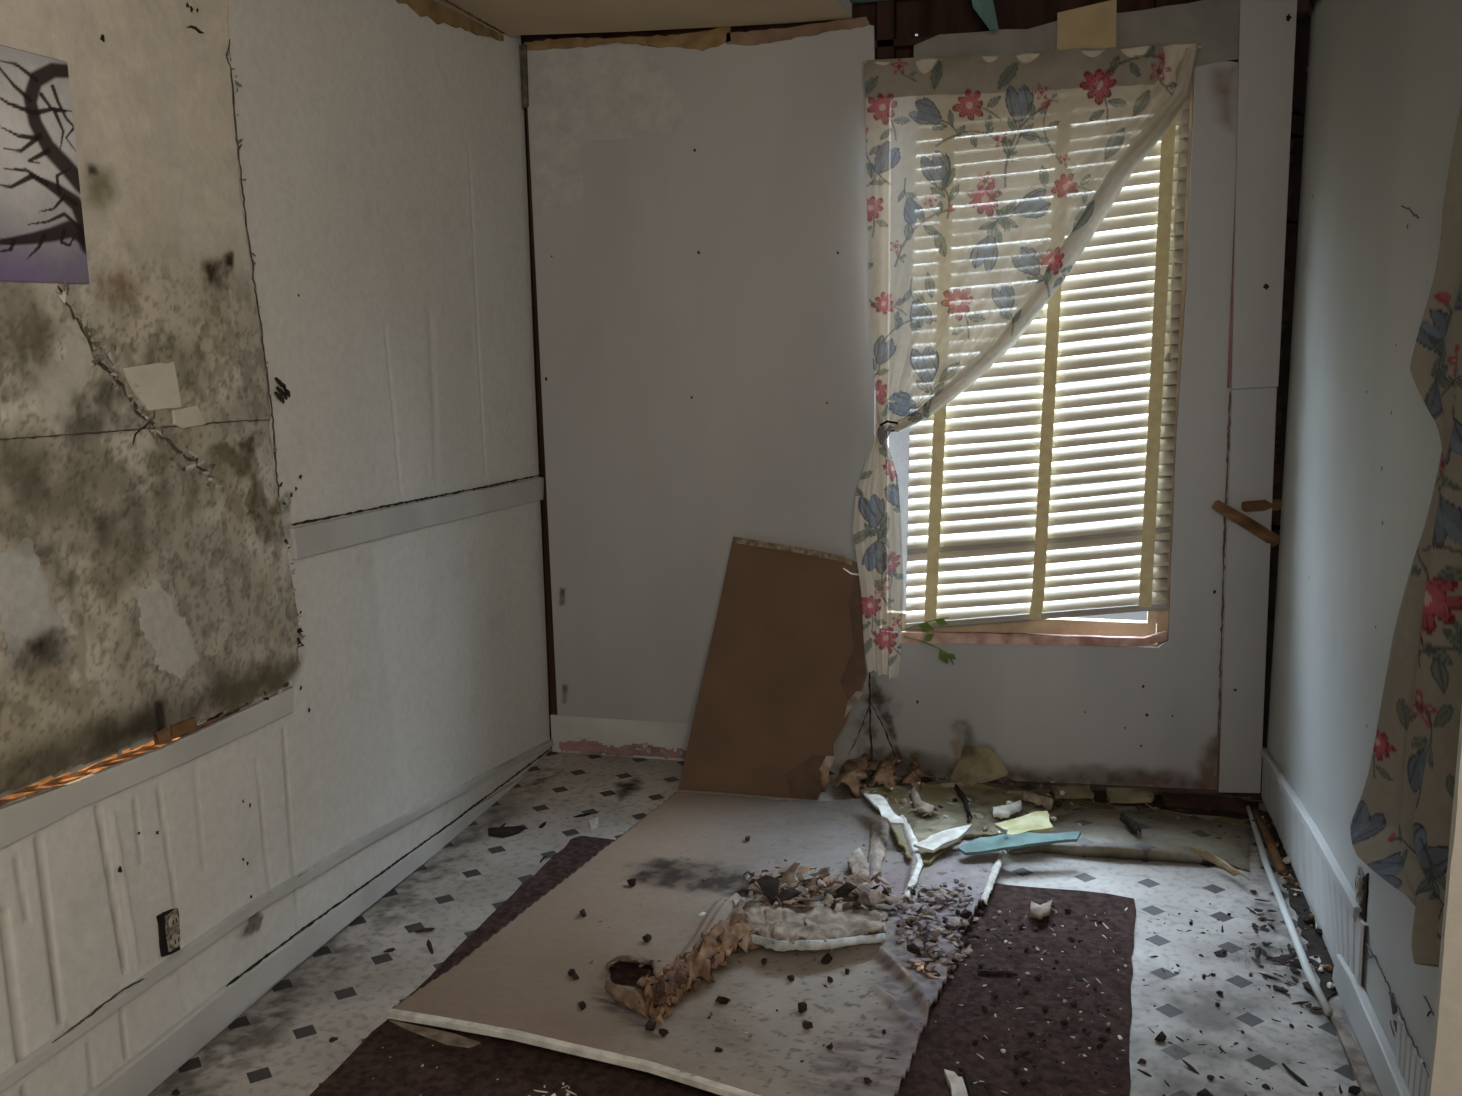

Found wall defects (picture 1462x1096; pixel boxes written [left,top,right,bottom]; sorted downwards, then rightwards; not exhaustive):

water stain [207,255,233,286]
crack [0,39,543,526]
water stain [215,442,290,542]
water stain [33,638,60,662]
water stain [7,702,166,791]